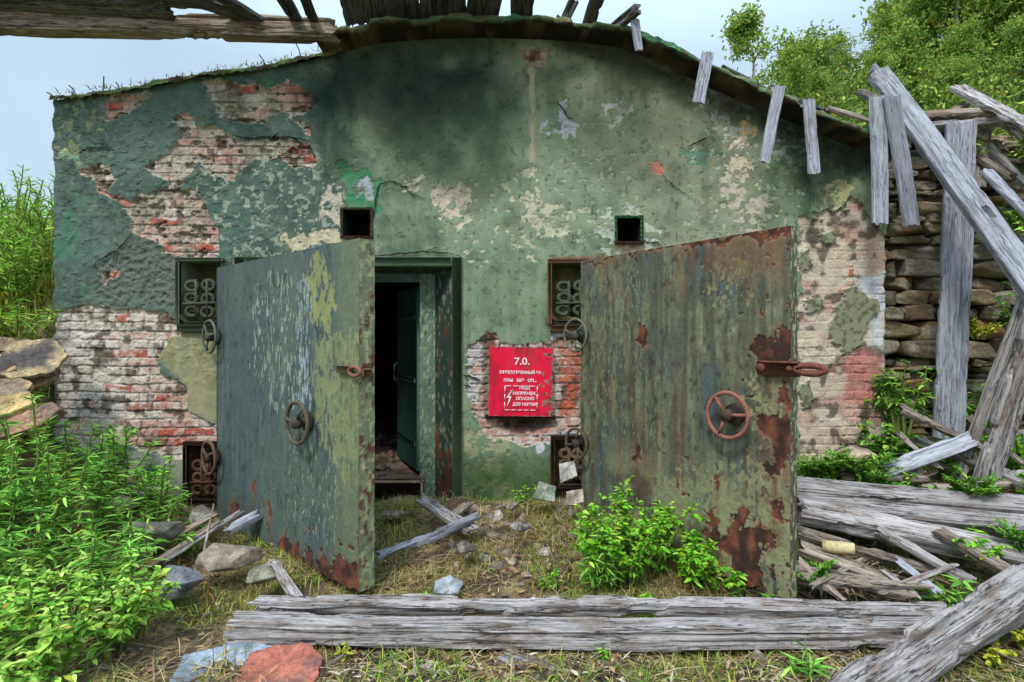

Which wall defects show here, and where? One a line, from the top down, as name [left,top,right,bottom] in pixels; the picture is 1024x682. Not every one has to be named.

damp [528,65,536,163]
peeling [541,98,586,156]
crack [373,178,427,219]
peeling [402,173,473,229]
rust [553,226,791,271]
spalling [52,77,386,545]
spalling [463,166,663,499]
spalling [650,164,887,599]
rust [748,324,791,361]
rust [219,490,250,521]
rust [702,376,791,597]
rust [272,514,359,592]